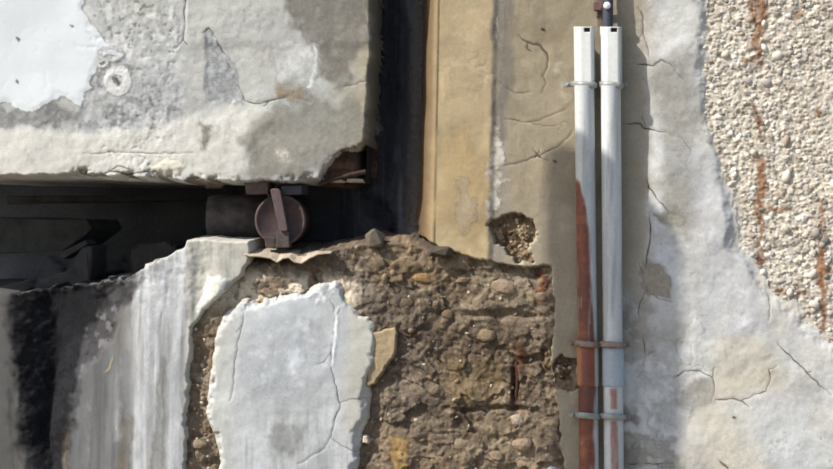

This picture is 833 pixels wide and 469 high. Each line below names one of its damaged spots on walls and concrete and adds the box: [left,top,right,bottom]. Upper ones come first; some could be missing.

crack [520,28,548,91]
crack [637,7,684,79]
rust [744,0,766,62]
crack [498,111,570,167]
spalling [702,0,833,342]
rust [754,158,787,268]
spalling [186,126,578,469]
rust [816,241,829,334]
damp [61,425,71,469]
crack [298,344,361,464]